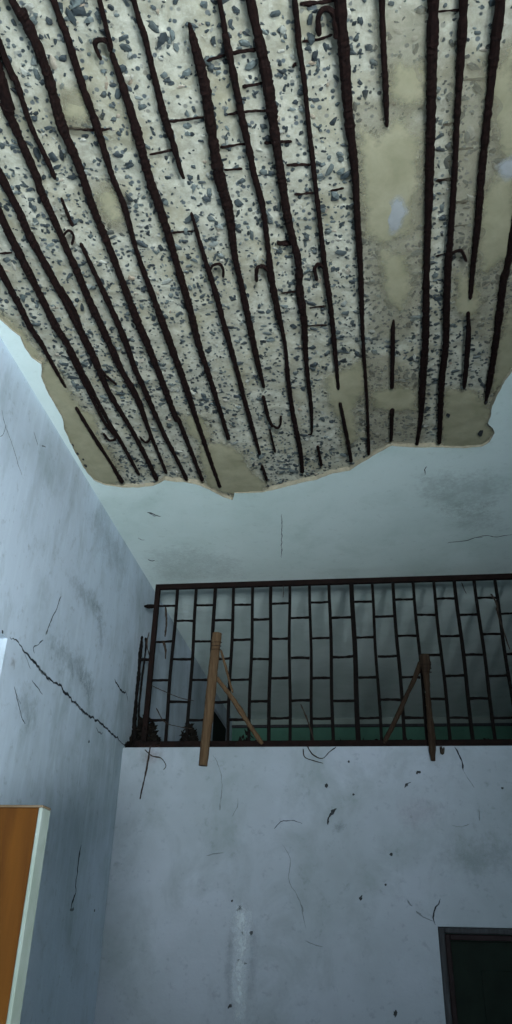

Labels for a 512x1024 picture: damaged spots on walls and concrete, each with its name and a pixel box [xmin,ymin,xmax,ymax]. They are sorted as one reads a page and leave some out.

spalling [0,0,512,500]
crack [12,597,124,745]